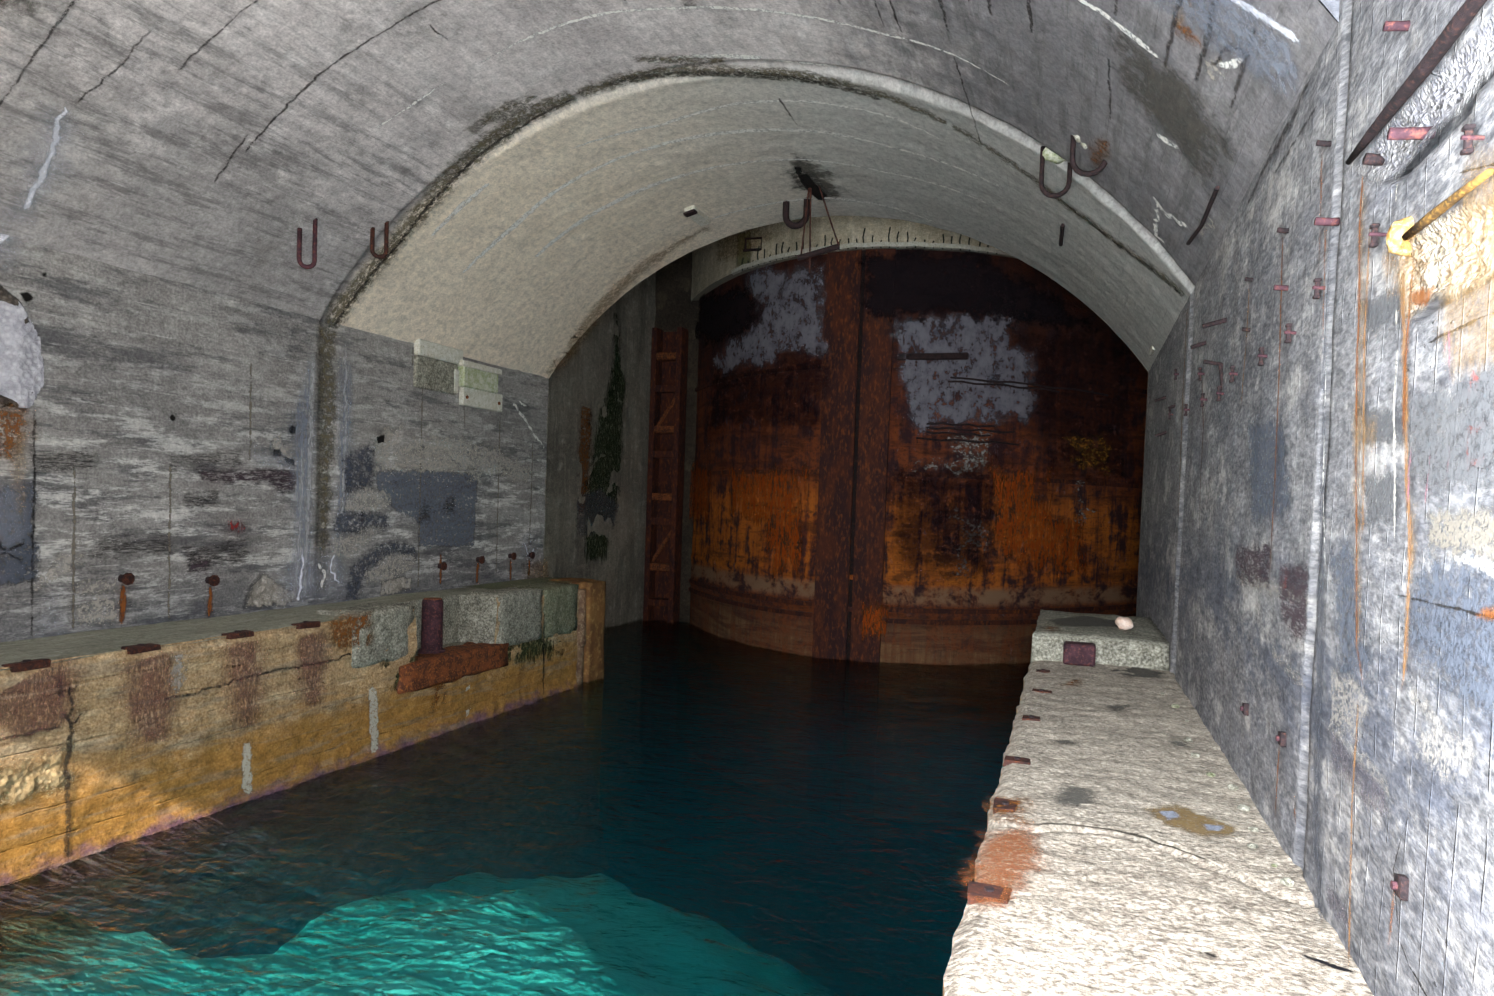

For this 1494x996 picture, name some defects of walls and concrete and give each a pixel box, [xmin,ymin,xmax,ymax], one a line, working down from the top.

crack [0,1,74,105]
crack [215,0,447,181]
crack [938,0,1033,141]
spalling [0,285,44,410]
damp [294,56,1184,601]
corrosion [1355,176,1370,671]
corrosion [1401,267,1434,680]
corrosion [0,660,71,736]
corrosion [127,654,174,741]
crack [0,688,81,857]
corrosion [963,797,1040,907]
crack [1006,819,1205,860]